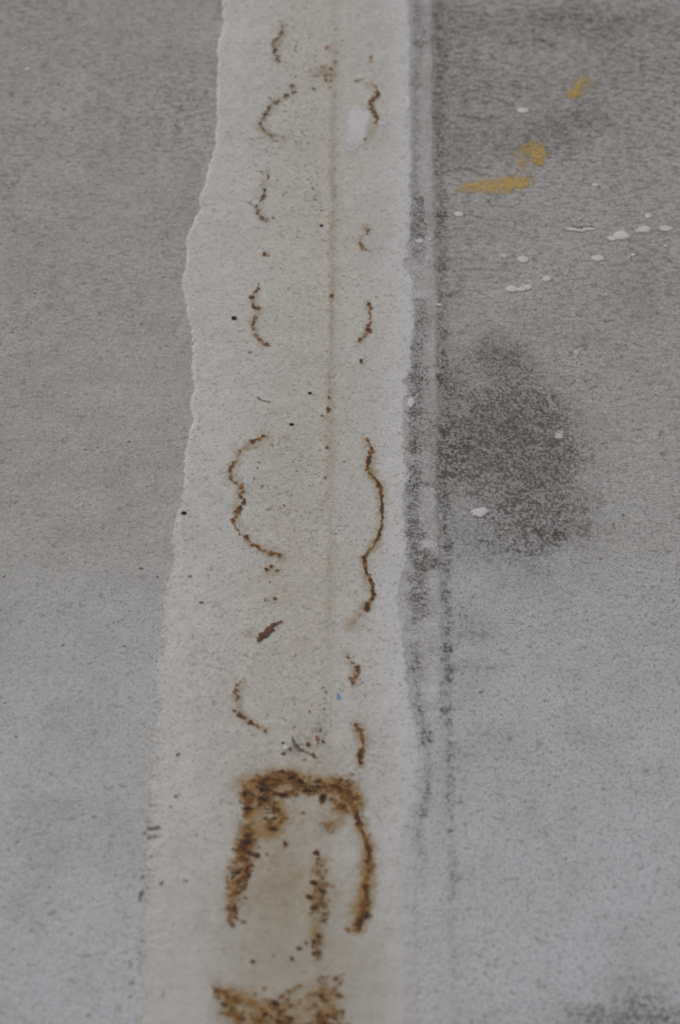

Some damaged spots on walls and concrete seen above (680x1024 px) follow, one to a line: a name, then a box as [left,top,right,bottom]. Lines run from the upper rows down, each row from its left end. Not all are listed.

rust [368,83,381,123]
water stain [411,1,455,280]
rust [248,283,270,346]
rust [228,434,281,582]
rust [359,438,384,615]
water stain [406,293,585,621]
rust [257,620,283,641]
water stain [442,590,453,681]
rust [232,681,267,732]
rust [226,723,375,932]
rust [290,850,334,961]
rust [212,974,350,1024]